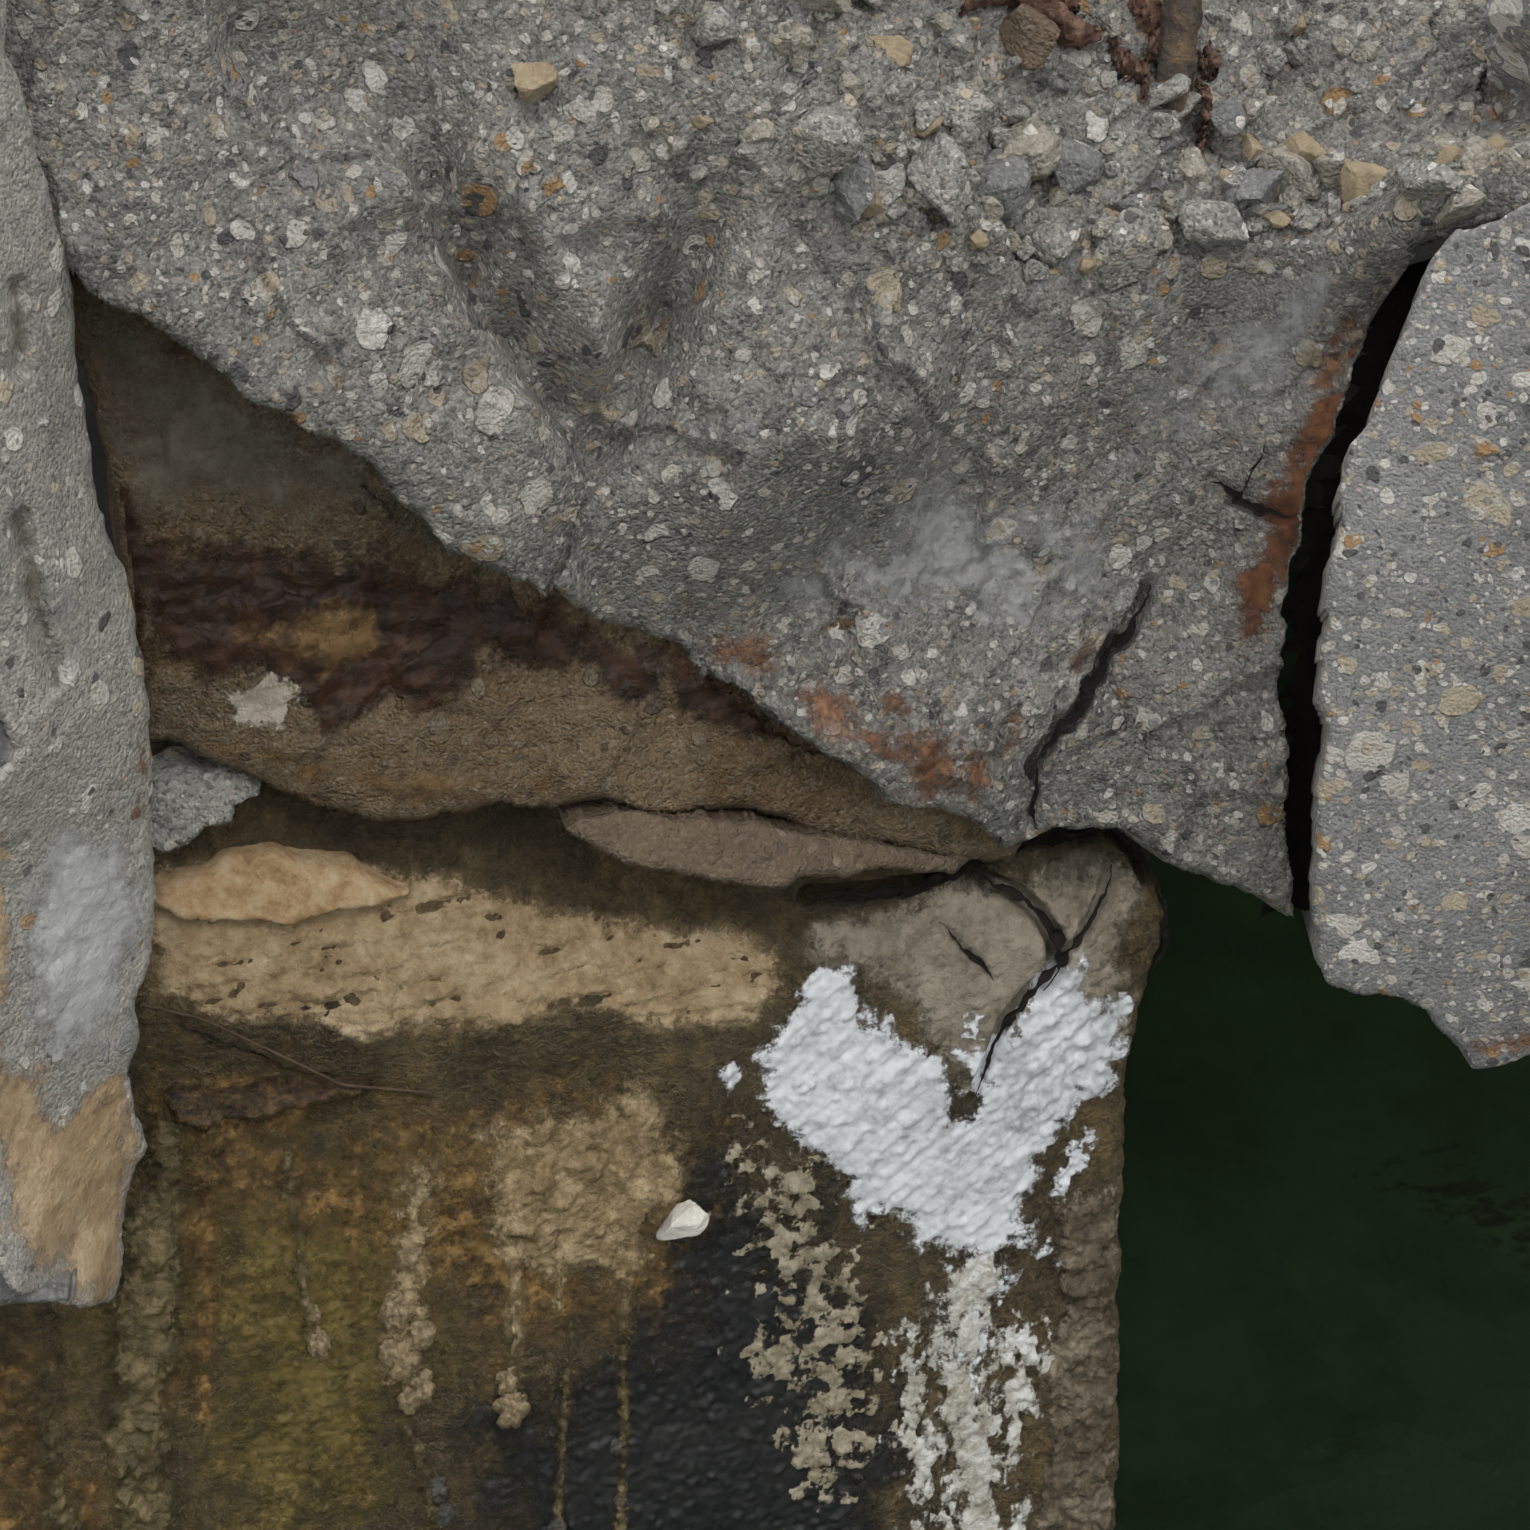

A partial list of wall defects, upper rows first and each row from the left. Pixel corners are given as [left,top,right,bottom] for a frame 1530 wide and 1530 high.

spalling [0,0,1022,1309]
rust [797,680,1023,808]
crack [1028,584,1151,831]
rust [1230,316,1366,641]
crack [1209,257,1433,917]